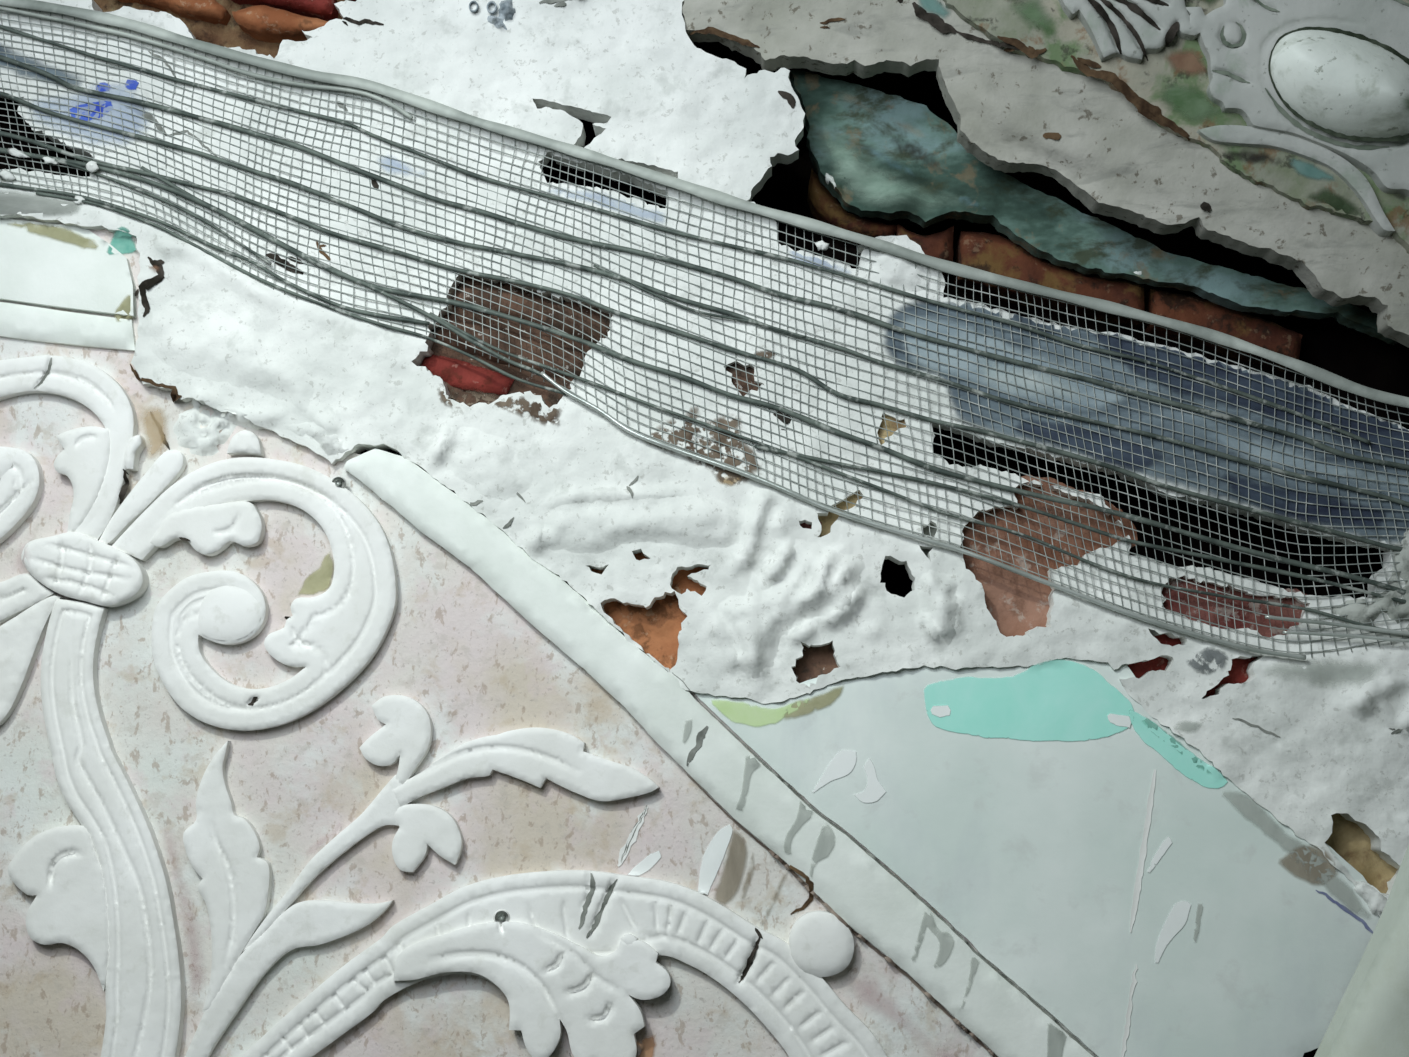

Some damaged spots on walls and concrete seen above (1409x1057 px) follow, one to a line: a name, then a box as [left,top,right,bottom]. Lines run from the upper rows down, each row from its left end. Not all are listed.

spalling [94,0,357,58]
spalling [754,151,1409,429]
spalling [419,277,612,408]
spalling [726,363,761,396]
spalling [603,567,708,671]
spalling [792,643,838,683]
spalling [960,475,1138,637]
spalling [1162,577,1307,637]
spalling [1325,813,1398,917]